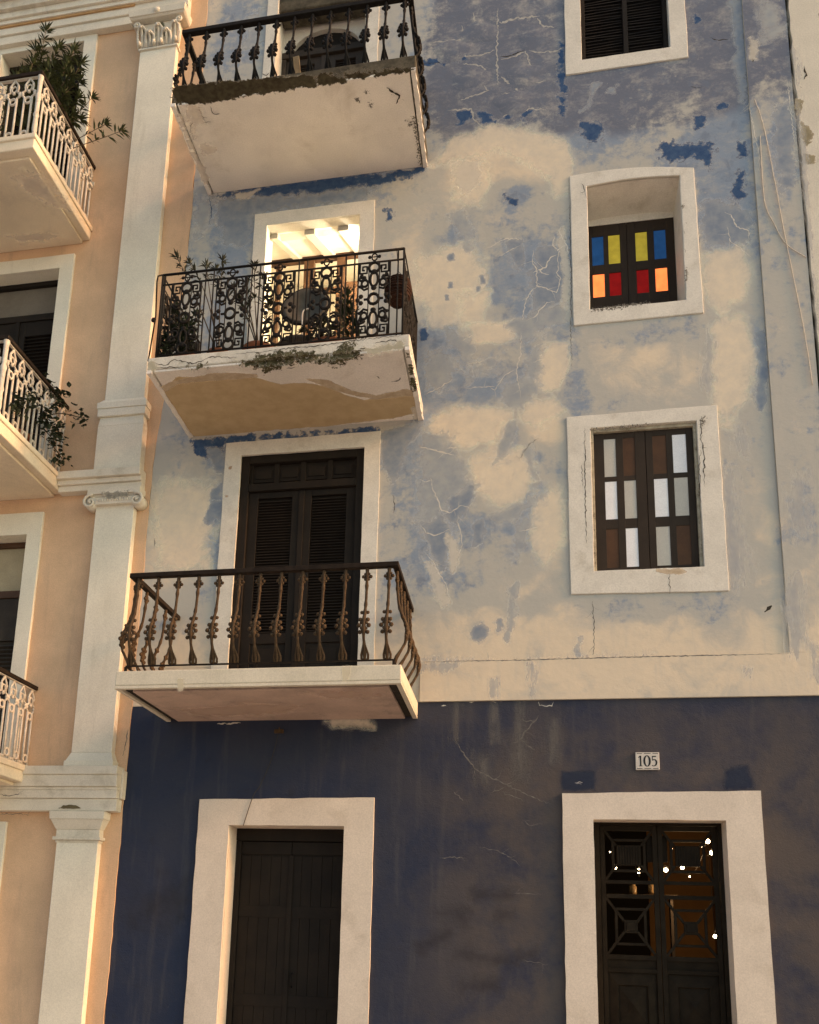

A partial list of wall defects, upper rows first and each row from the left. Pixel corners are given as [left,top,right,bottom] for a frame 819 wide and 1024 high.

peeling [441,108,572,193]
peeling [655,102,729,172]
peeling [772,98,815,193]
peeling [418,246,514,343]
crack [427,184,586,398]
peeling [502,228,571,316]
peeling [699,141,769,426]
peeling [189,343,568,606]
crack [421,447,469,598]
crack [580,430,588,542]
crack [698,416,706,497]
crack [454,741,550,826]